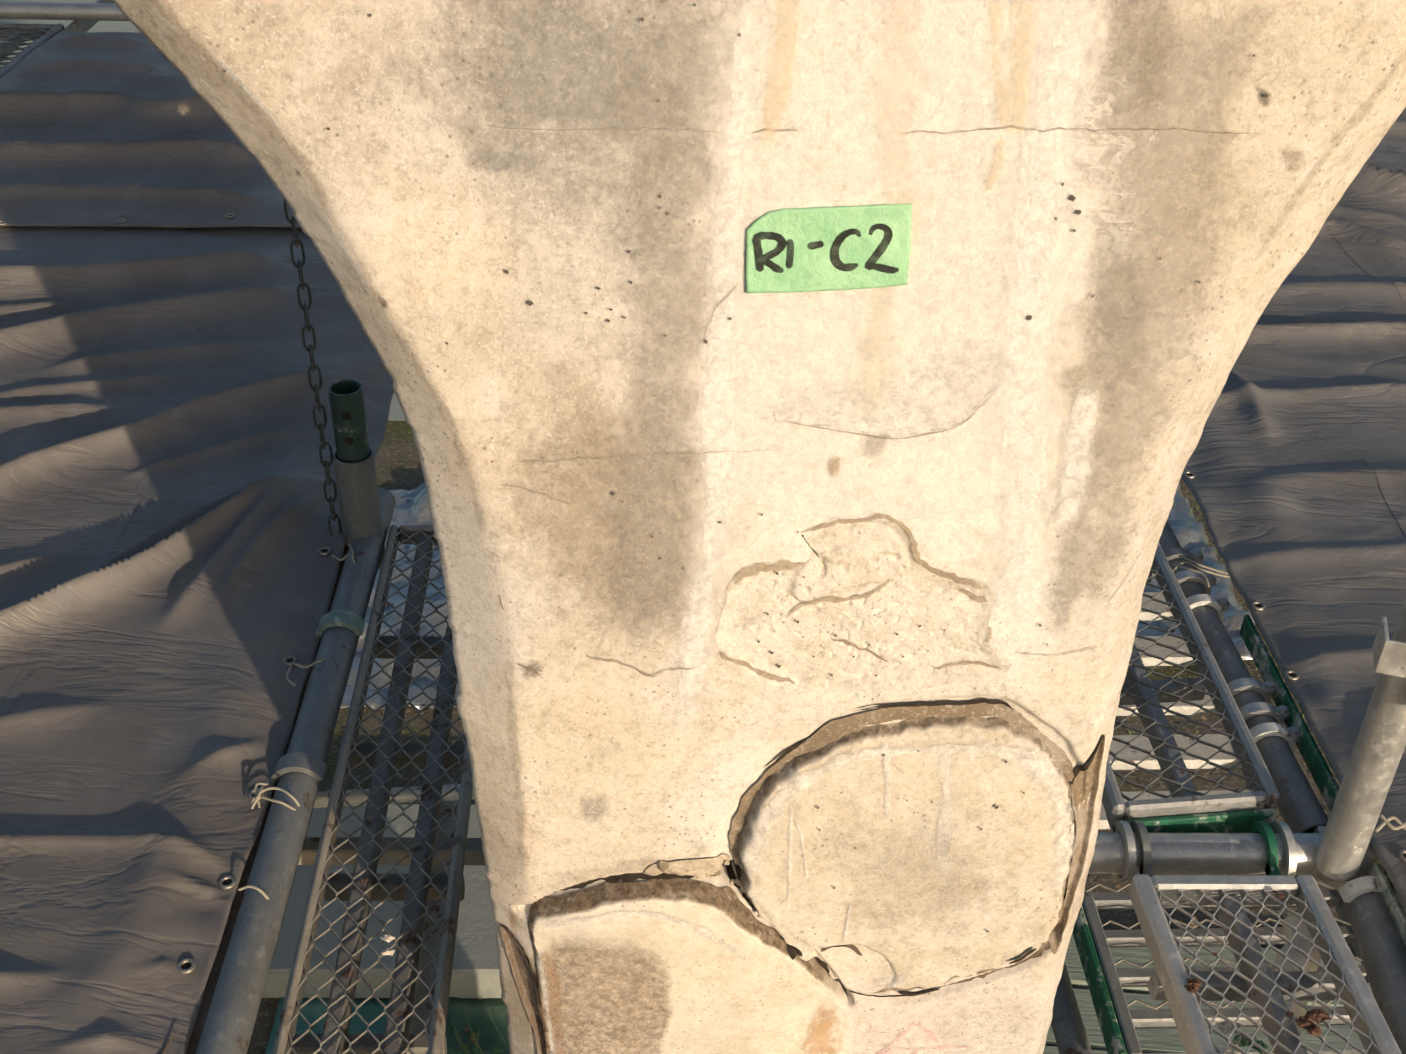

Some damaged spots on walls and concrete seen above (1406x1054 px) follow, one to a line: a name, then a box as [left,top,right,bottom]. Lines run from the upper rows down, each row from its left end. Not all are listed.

crack [494,126,798,134]
crack [902,125,1240,134]
leakage [489,0,708,621]
leakage [679,44,749,704]
spalling [715,514,1007,711]
crack [544,514,1104,911]
crack [787,943,1050,1000]